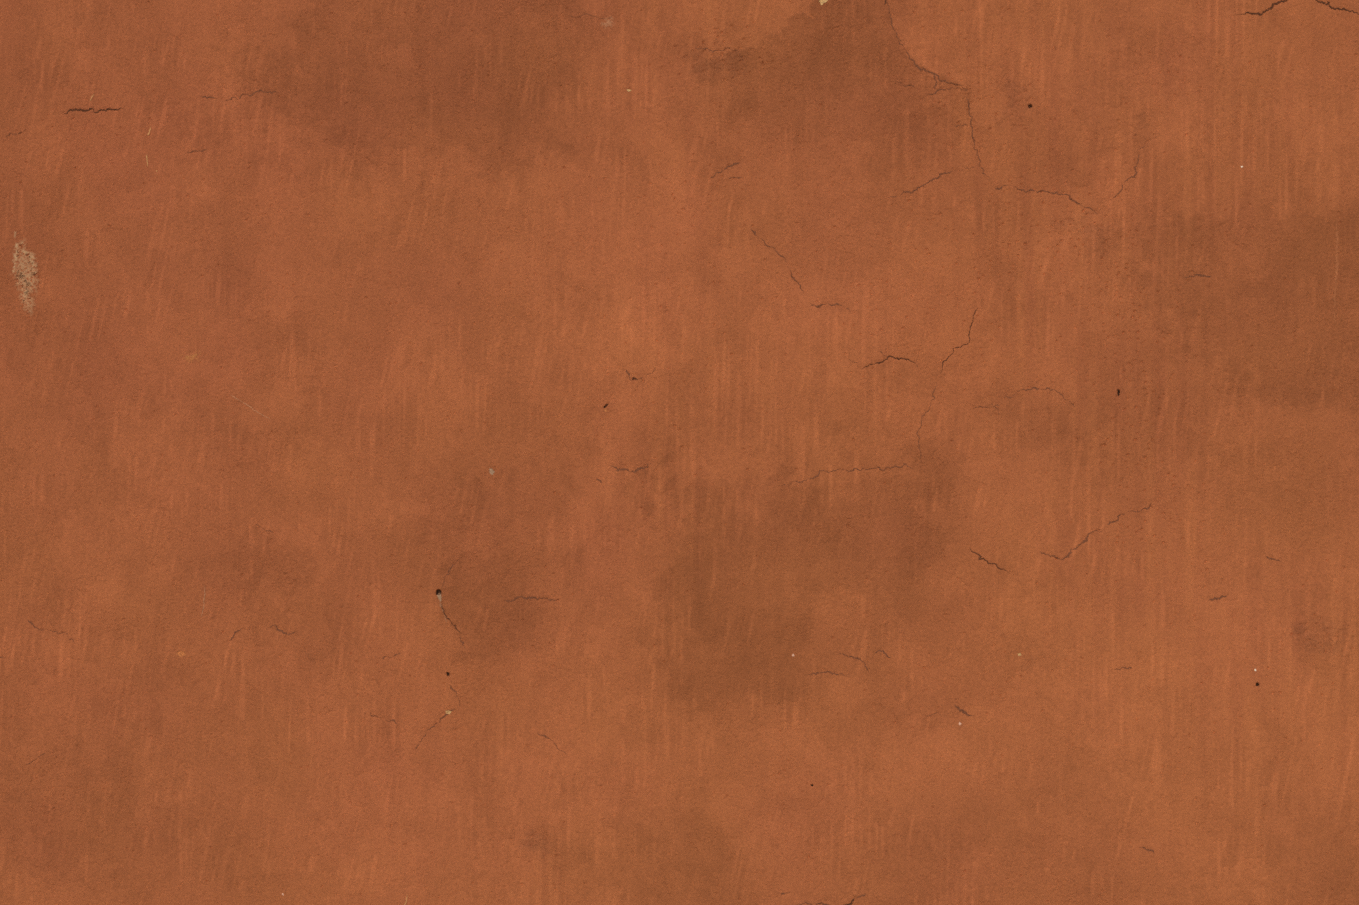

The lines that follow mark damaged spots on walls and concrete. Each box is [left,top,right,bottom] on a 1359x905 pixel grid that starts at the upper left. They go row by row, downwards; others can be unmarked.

crack [1239,0,1358,16]
crack [885,0,1145,211]
crack [973,387,1075,414]
crack [441,557,465,648]